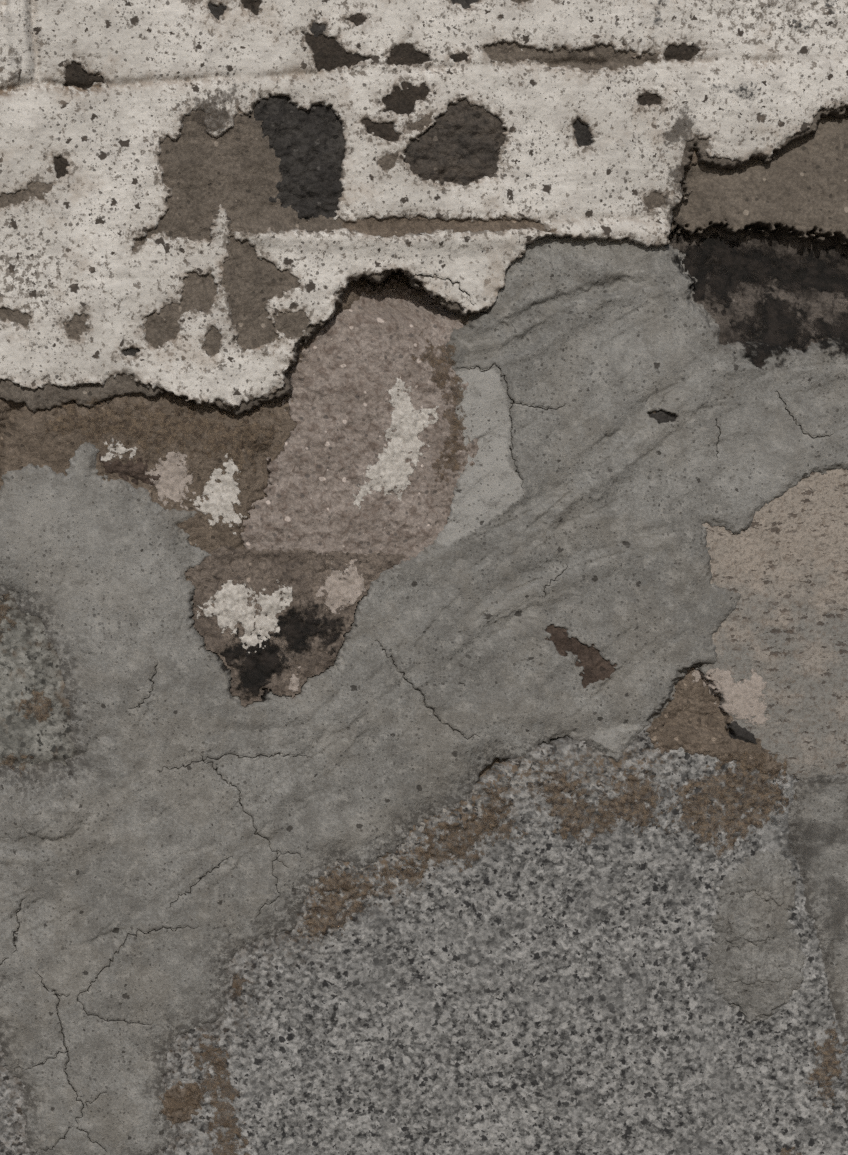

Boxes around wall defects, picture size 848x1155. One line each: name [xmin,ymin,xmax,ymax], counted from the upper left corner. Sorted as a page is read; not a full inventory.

peeling [301,31,371,72]
peeling [387,43,432,66]
peeling [637,92,662,106]
peeling [0,157,70,208]
peeling [132,82,557,356]
damp [730,292,848,368]
crack [473,363,570,489]
spalling [184,546,405,707]
crack [378,641,478,739]
spalling [545,624,616,688]
crack [160,753,307,923]
crack [4,856,231,1153]